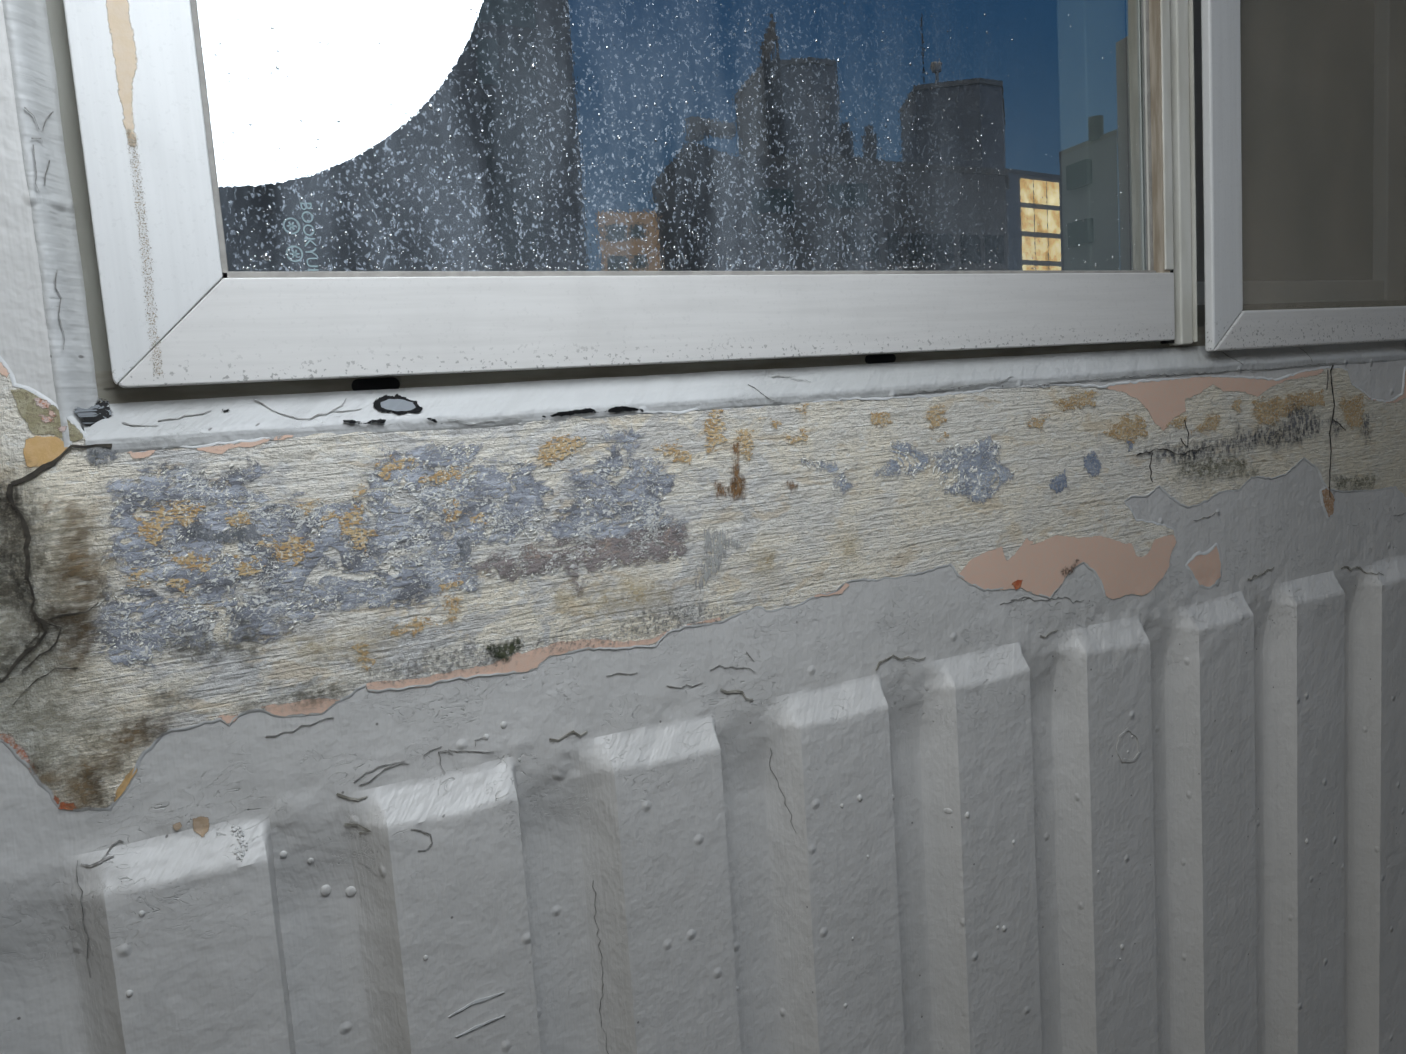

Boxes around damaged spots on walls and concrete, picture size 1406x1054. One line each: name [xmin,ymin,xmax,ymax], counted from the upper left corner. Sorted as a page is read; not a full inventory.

crack [253,399,362,419]
crack [899,348,1346,497]
leakage [1146,406,1339,477]
leakage [0,487,166,809]
crack [0,410,211,706]
peeling [0,356,1406,812]
crack [354,761,404,782]
crack [76,840,124,978]